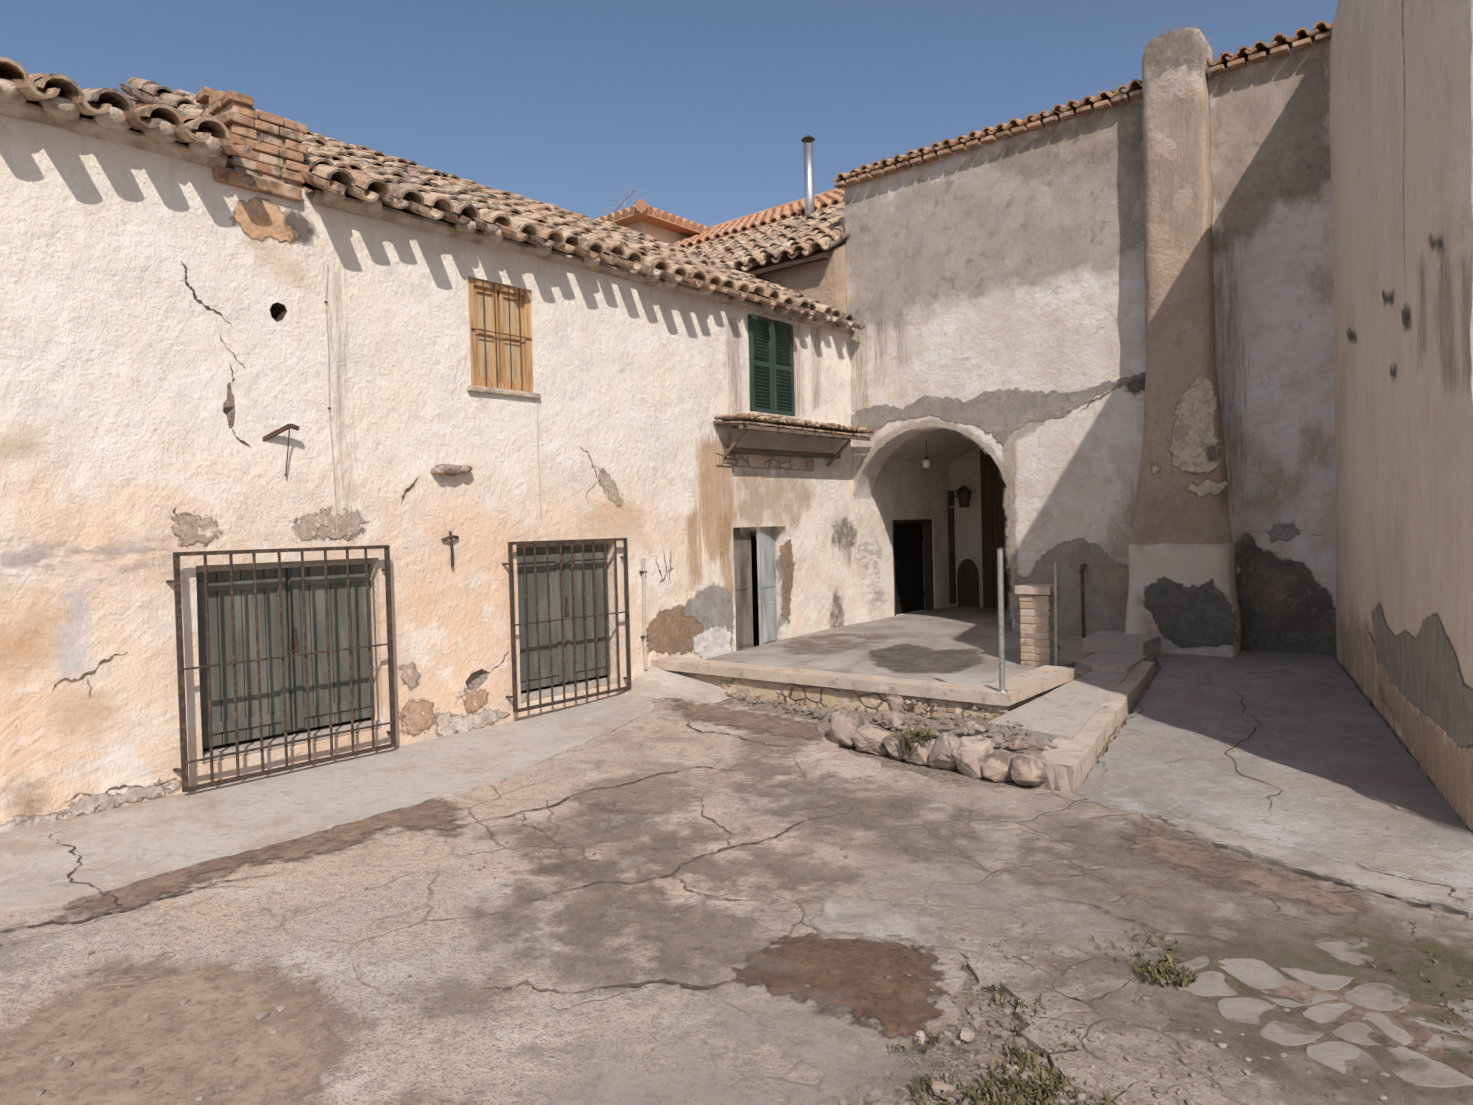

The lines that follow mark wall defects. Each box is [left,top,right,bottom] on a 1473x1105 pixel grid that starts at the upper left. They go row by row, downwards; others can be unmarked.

peeling [232,198,301,243]
crack [182,263,245,368]
spalling [1083,378,1145,409]
peeling [1149,375,1228,498]
peeling [171,508,222,547]
peeling [293,507,369,542]
spalling [646,584,734,659]
crack [52,652,127,698]
peeling [399,652,509,737]
crack [1147,669,1335,822]
peeling [1365,603,1473,821]
crack [0,831,282,950]